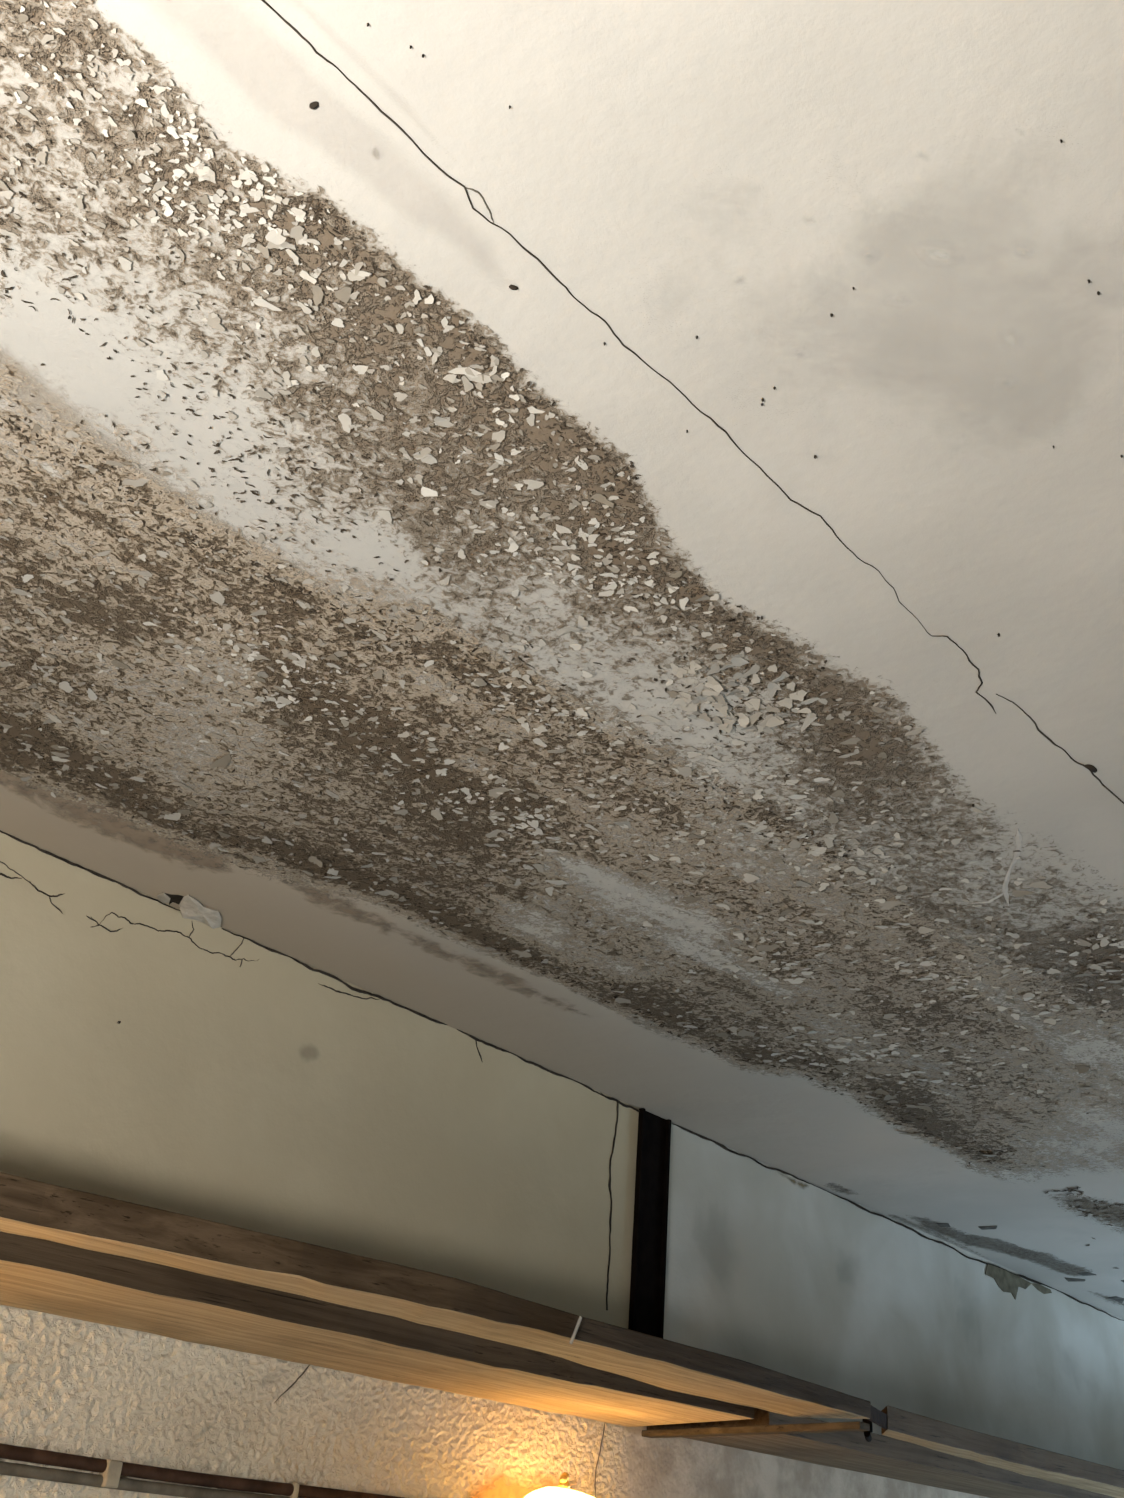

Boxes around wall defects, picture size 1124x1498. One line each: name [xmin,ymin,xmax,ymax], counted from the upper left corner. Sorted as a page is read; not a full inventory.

crack [261,0,1124,804]
peeling [0,0,1124,1179]
crack [0,830,1124,1321]
peeling [1045,1187,1124,1232]
peeling [889,1215,1124,1307]
crack [275,1365,310,1402]
crack [594,1423,605,1498]